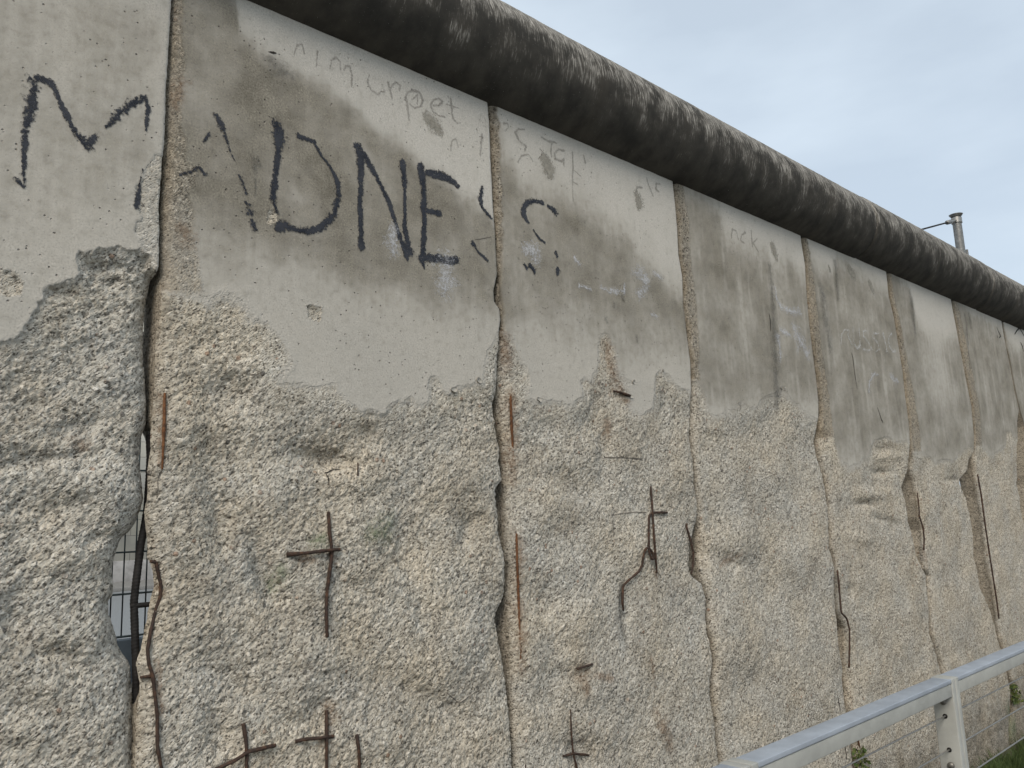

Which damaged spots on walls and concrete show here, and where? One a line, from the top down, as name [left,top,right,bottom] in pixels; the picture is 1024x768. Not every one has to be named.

spalling [135,0,512,768]
spalling [0,155,162,768]
spalling [495,184,1024,768]
rust [130,393,166,768]
rust [286,512,341,637]
rust [621,486,668,611]
rust [836,570,851,668]
rust [977,474,1000,619]
rust [215,723,276,768]
rust [295,710,335,768]
rust [563,709,590,768]